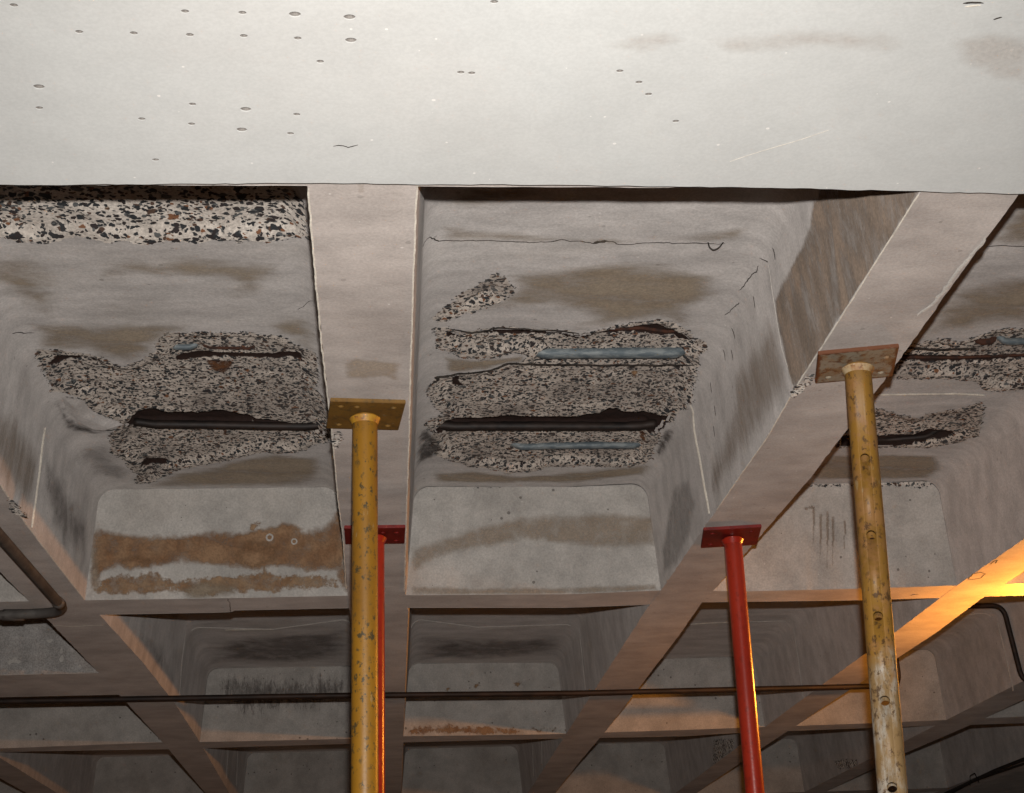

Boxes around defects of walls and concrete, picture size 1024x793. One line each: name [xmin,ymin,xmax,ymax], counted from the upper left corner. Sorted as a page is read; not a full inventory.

spalling [0,185,312,245]
crack [424,237,725,245]
water stain [517,268,702,319]
spalling [34,331,344,484]
spalling [424,273,708,474]
spalling [835,428,850,449]
spalling [875,327,1024,448]
rust [93,511,345,597]